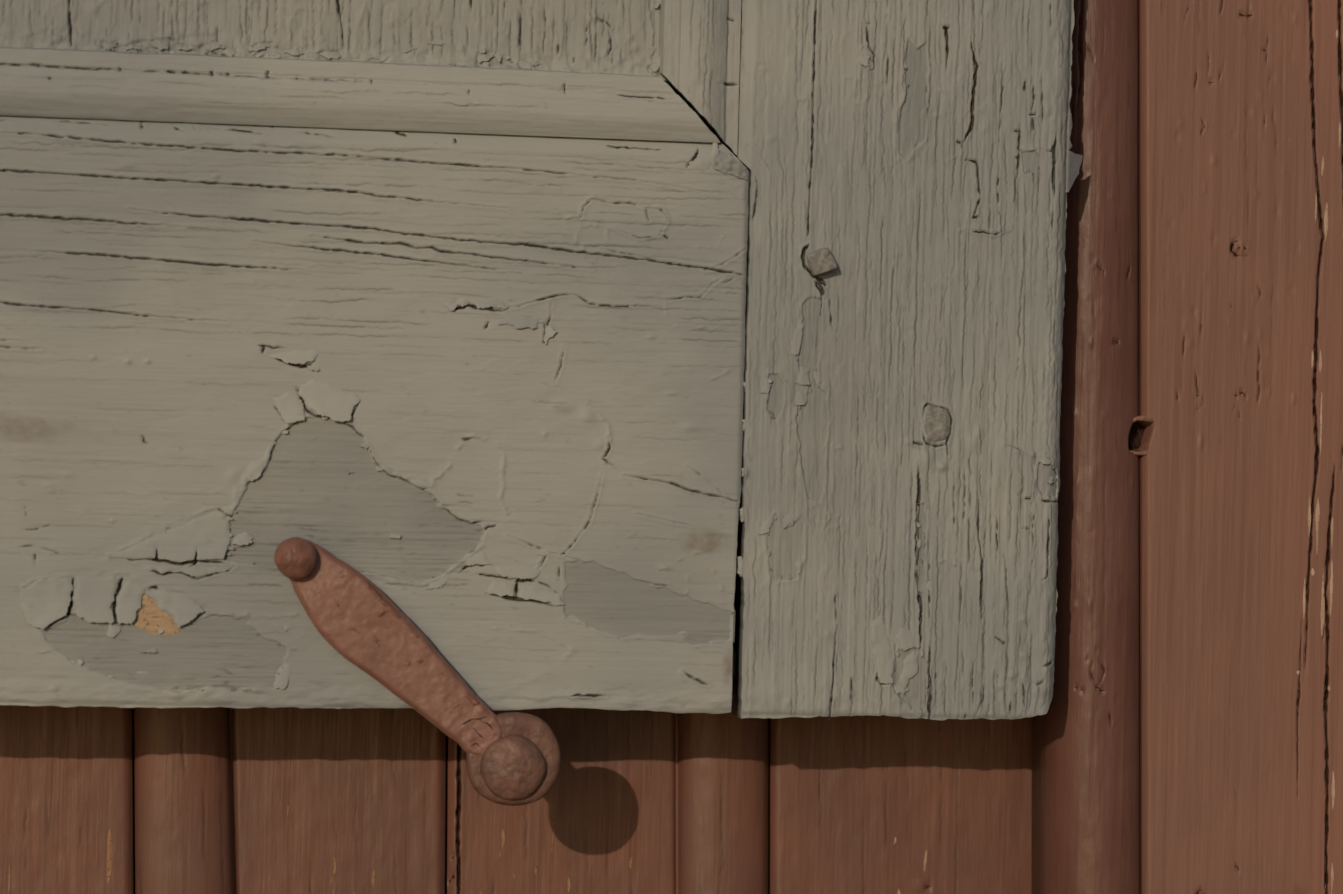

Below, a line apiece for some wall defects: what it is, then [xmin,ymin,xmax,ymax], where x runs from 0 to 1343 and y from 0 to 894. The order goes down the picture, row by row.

crack [0,121,741,375]
crack [470,0,611,54]
crack [802,10,833,328]
crack [866,23,889,84]
crack [943,0,1094,235]
crack [1185,0,1270,81]
peeling [19,349,564,692]
crack [829,596,882,720]
peeling [871,616,930,714]
crack [911,404,1057,717]
crack [972,649,1111,721]
crack [1296,0,1343,894]